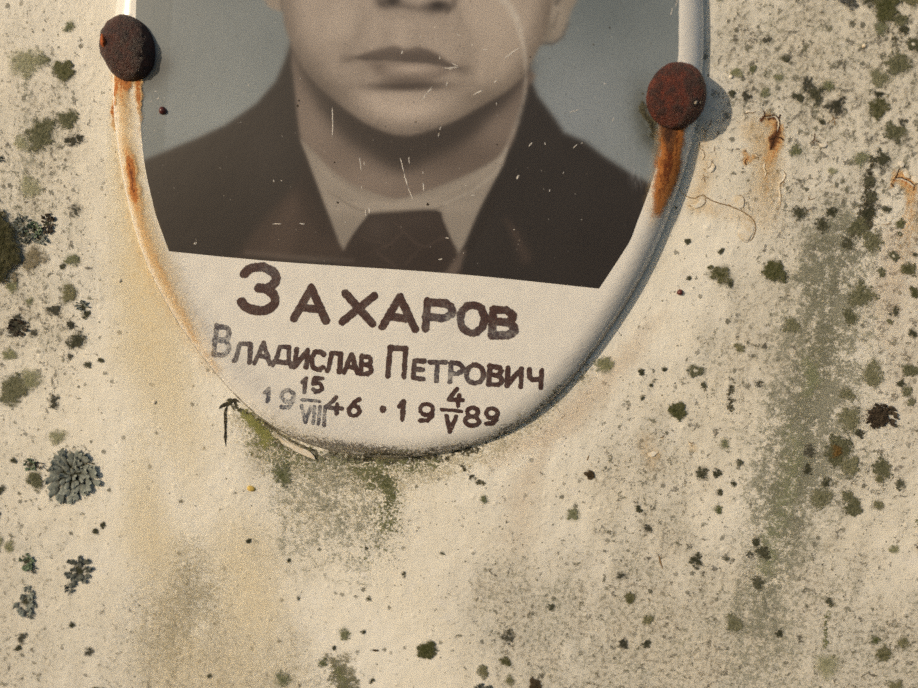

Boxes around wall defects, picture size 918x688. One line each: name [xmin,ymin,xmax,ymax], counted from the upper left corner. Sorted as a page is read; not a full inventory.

rust [110,74,143,131]
rust [653,126,687,217]
rust [743,114,784,173]
rust [890,171,917,227]
rust [122,145,184,322]